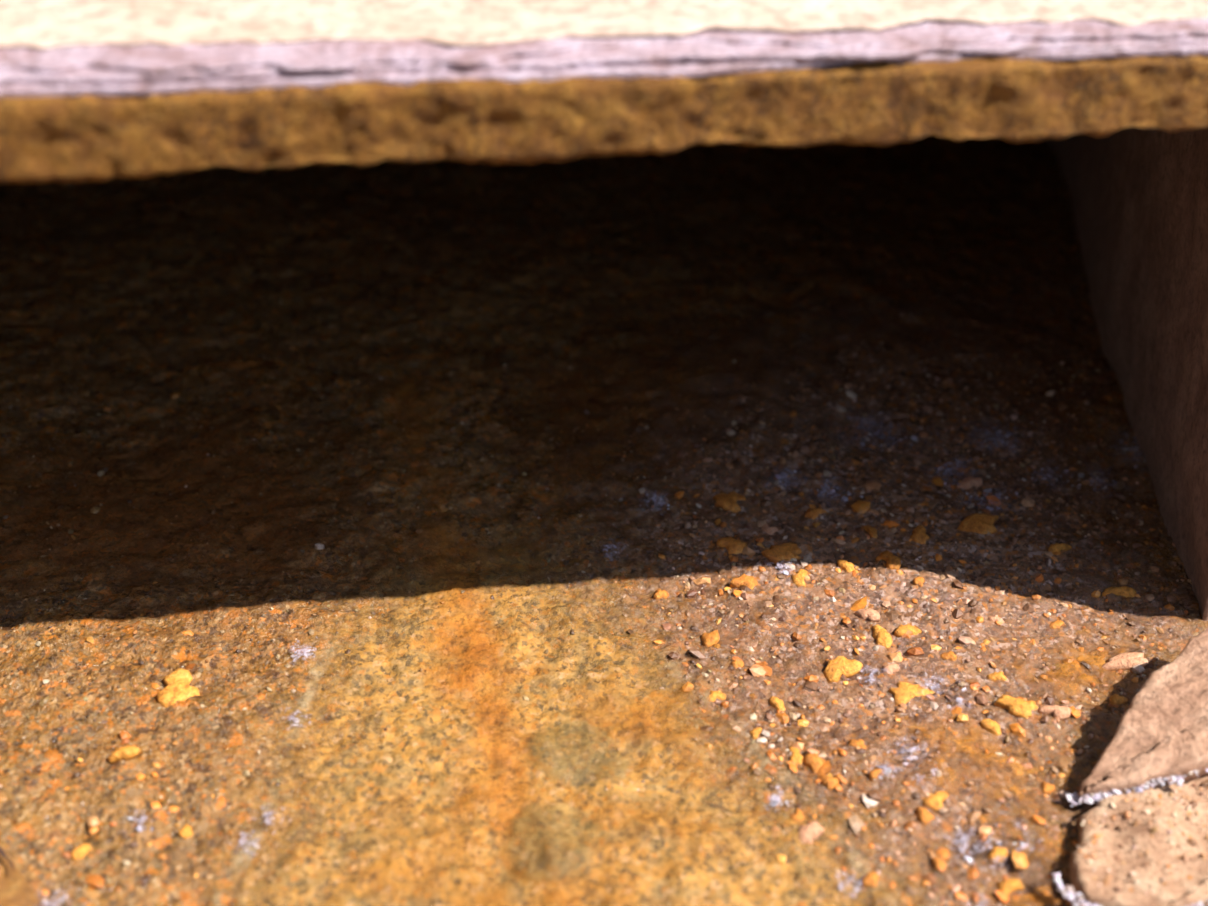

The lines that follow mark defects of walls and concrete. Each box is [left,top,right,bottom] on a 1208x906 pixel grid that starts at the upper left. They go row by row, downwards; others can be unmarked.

water stain [879,742,937,784]
water stain [947,824,1034,869]